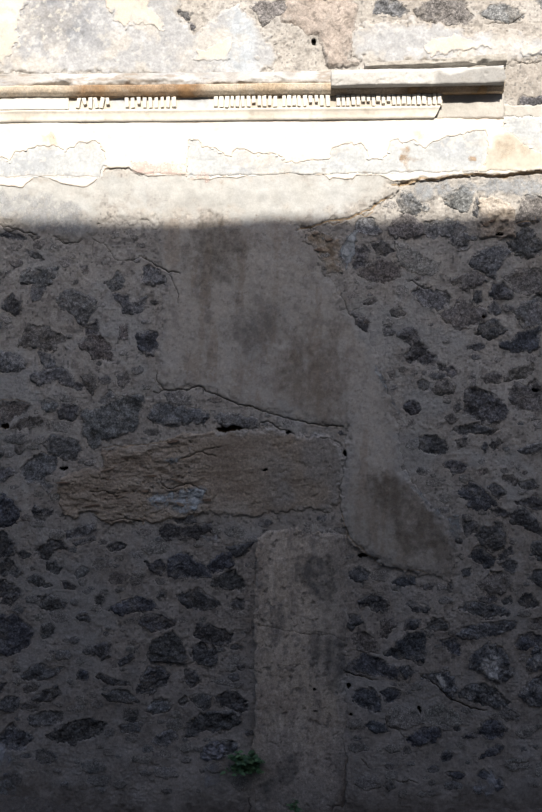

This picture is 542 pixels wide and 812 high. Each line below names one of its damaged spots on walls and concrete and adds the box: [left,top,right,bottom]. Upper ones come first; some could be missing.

flaking render [187,131,489,180]
flaking render [503,116,542,153]
crack [298,169,542,230]
crack [154,373,343,442]